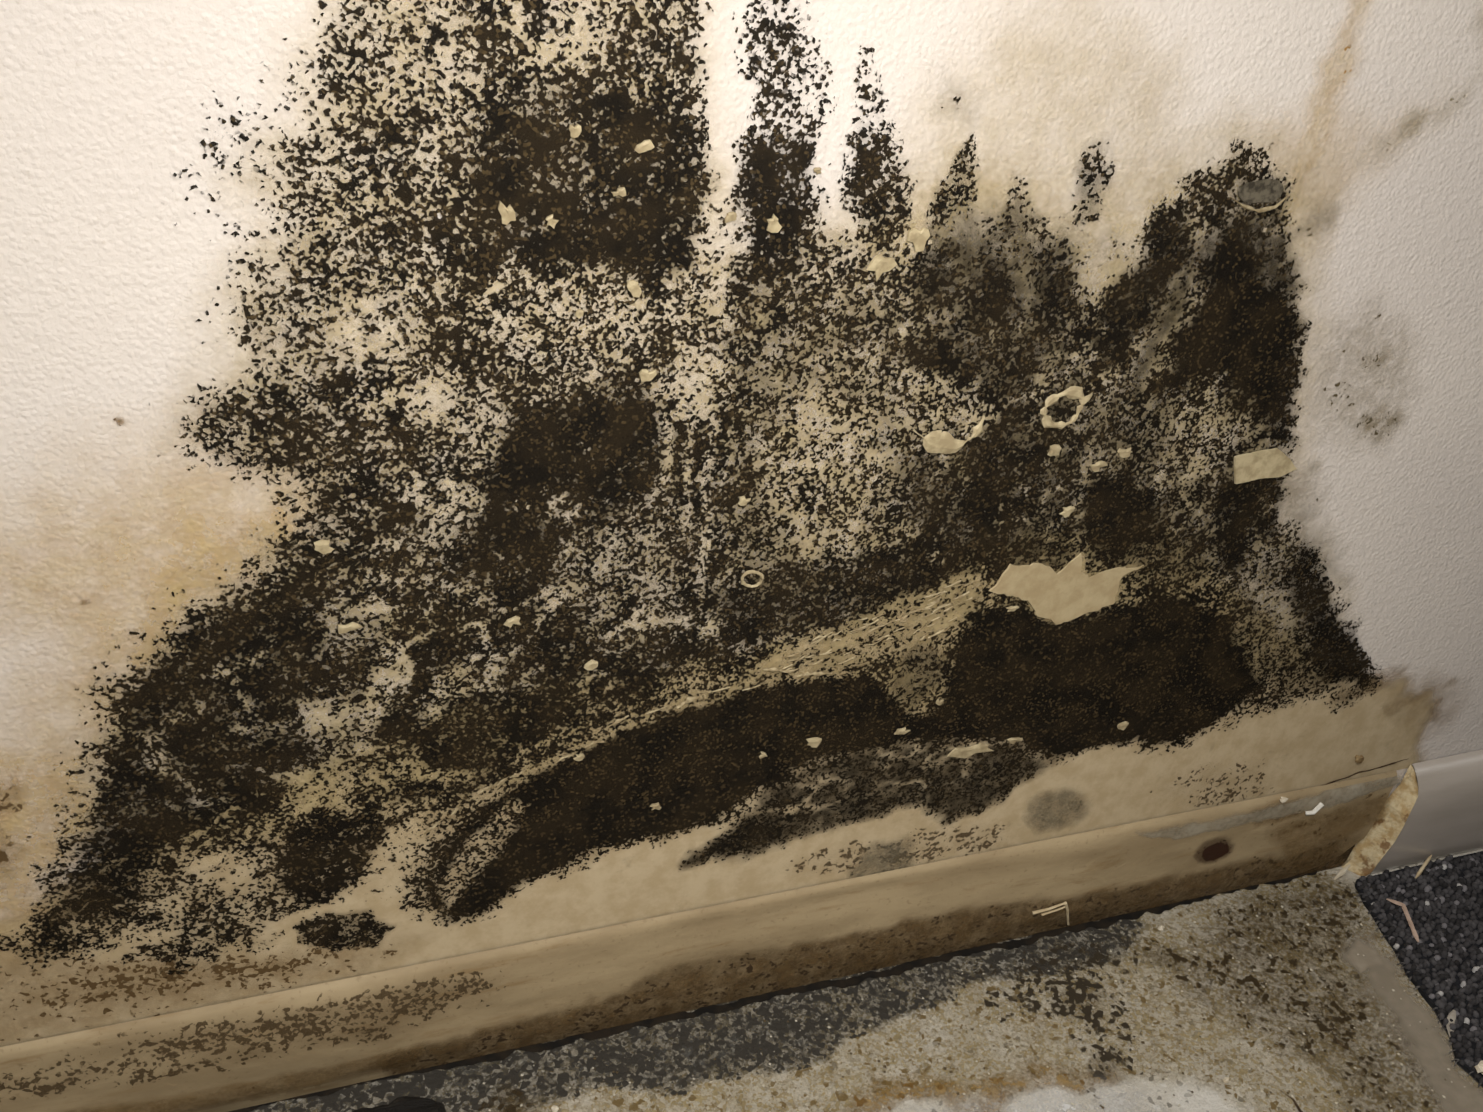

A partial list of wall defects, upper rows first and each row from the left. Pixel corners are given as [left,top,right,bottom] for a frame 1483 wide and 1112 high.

leakage [200,105,257,179]
peeling [634,139,654,153]
leakage [1067,142,1115,232]
leakage [223,223,266,241]
peeling [498,201,516,225]
leakage [706,198,728,238]
peeling [767,214,782,233]
peeling [912,415,985,454]
peeling [1234,448,1297,484]
spalling [553,553,1144,765]
leakage [250,871,1483,1112]
leakage [0,971,506,1100]